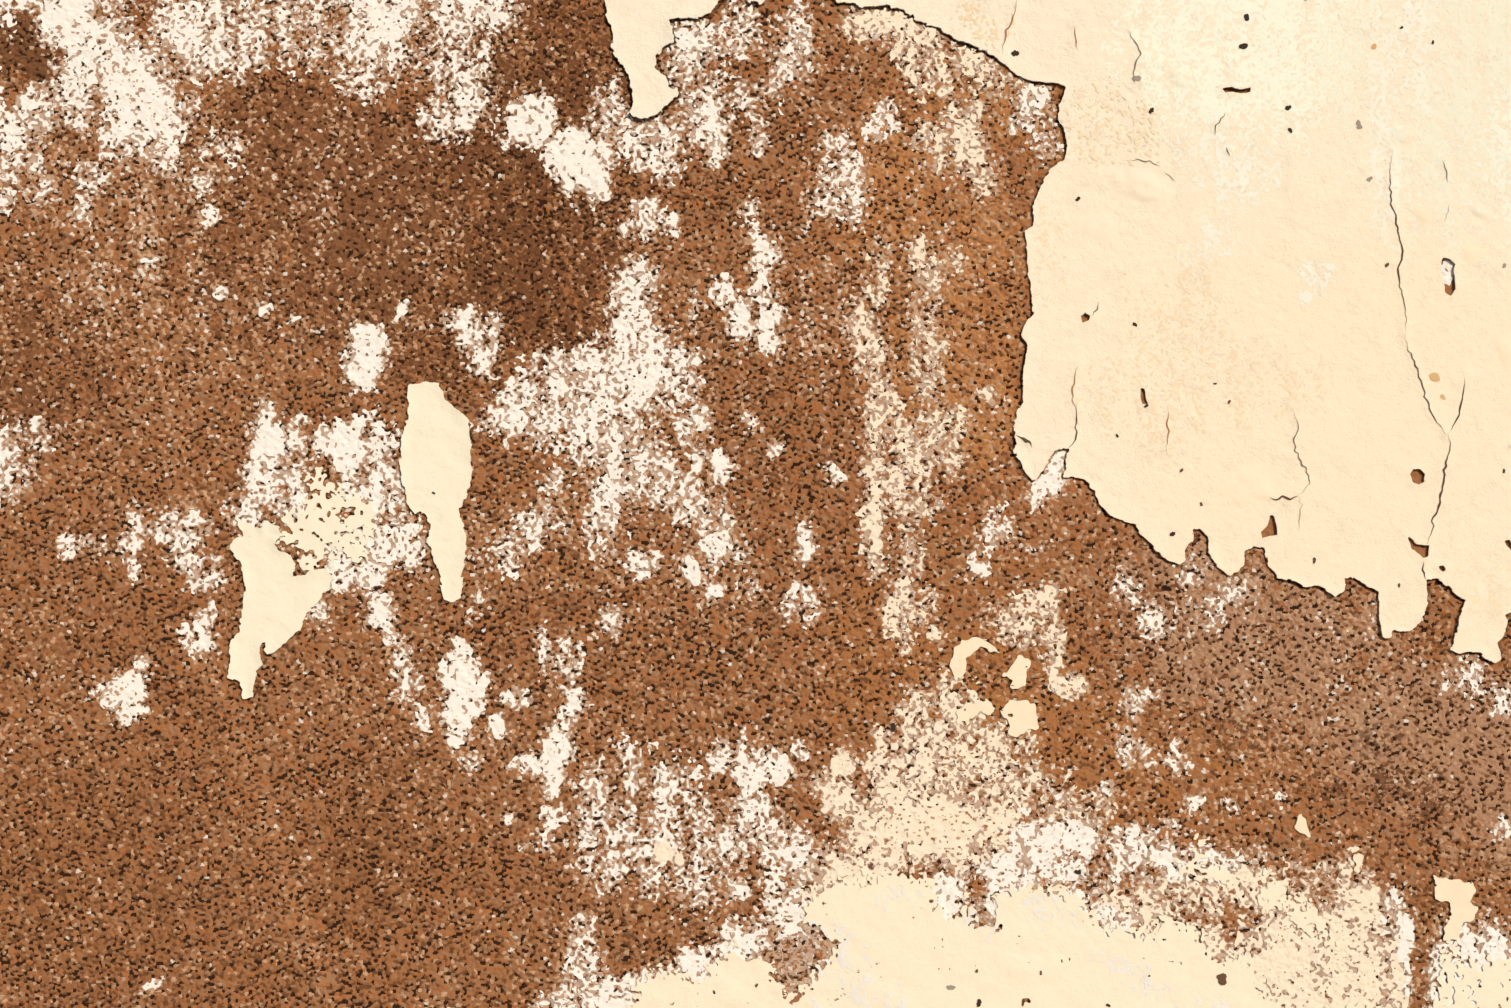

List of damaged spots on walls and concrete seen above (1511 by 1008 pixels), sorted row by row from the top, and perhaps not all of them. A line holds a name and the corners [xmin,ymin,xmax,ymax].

spalling [126,79,159,109]
peeling [1441,258,1455,296]
spalling [622,322,657,379]
crack [1389,156,1465,579]
peeling [1410,469,1424,484]
peeling [1261,515,1277,538]
peeling [1408,537,1429,558]
spalling [878,835,898,860]
spalling [915,812,942,849]
spalling [1310,961,1339,1003]